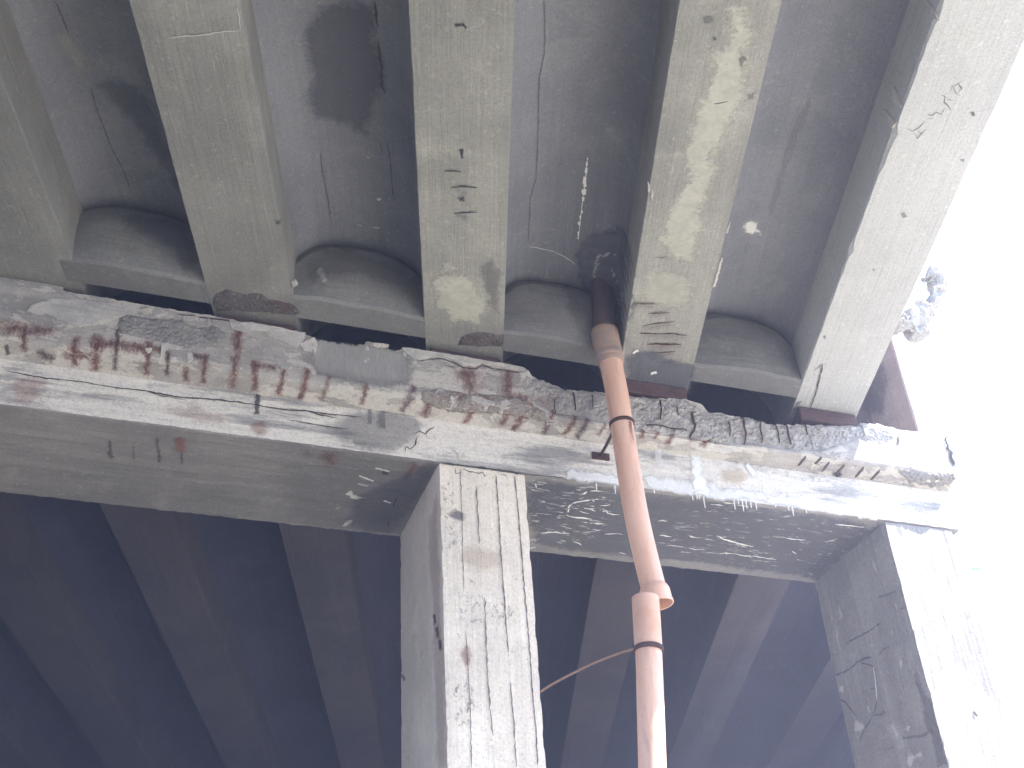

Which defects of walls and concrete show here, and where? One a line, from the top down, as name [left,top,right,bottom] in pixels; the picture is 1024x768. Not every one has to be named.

water stain [656,4,756,263]
water stain [745,221,760,234]
corrosion [4,324,171,375]
crack [8,371,358,429]
corrosion [230,330,286,395]
peeling [27,289,610,425]
corrosion [500,363,530,432]
crack [636,303,686,353]
spalling [629,396,895,474]
water stain [527,468,633,557]
water stain [642,450,899,580]
crack [438,462,625,767]